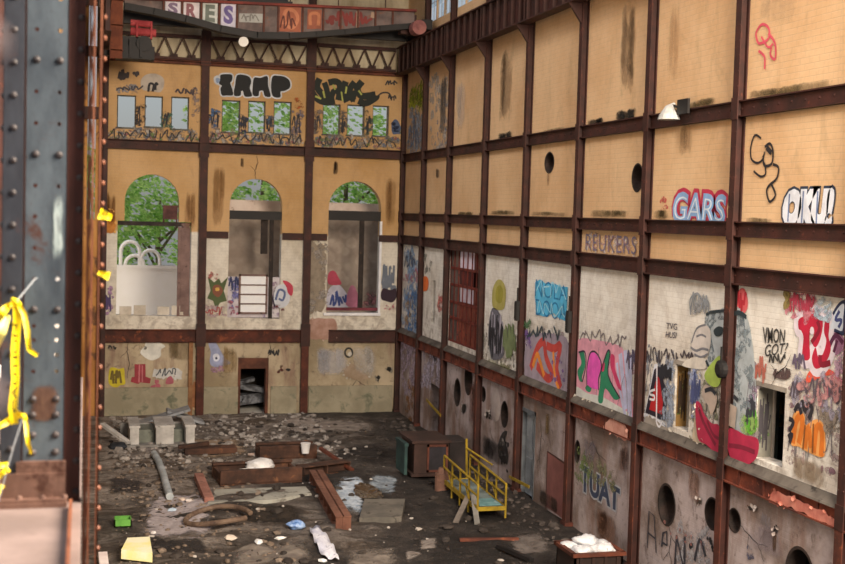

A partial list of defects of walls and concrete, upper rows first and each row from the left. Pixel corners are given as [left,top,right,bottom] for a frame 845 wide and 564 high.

peeling [603,410,628,441]
peeling [768,488,834,527]